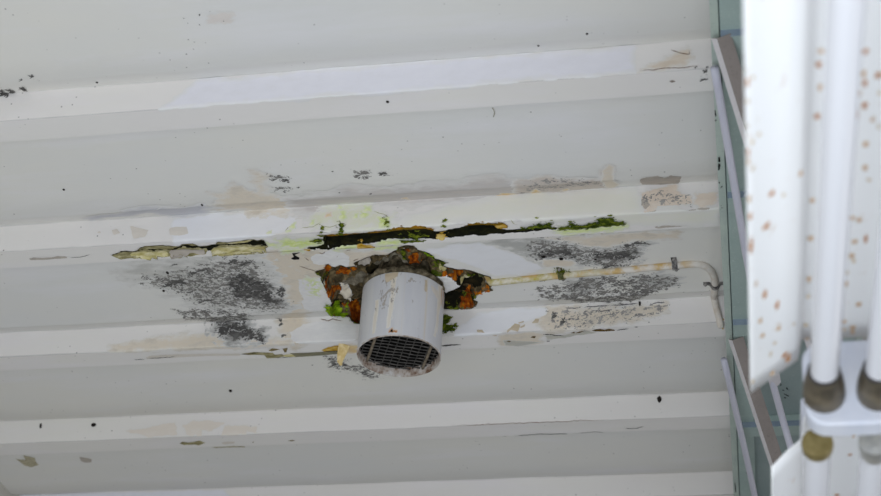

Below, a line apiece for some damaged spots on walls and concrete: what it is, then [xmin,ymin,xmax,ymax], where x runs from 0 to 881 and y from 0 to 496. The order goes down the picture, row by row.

peeling [640,182,723,213]
crack [265,211,630,256]
water stain [106,251,303,353]
water stain [483,229,687,335]
spalling [477,319,625,347]